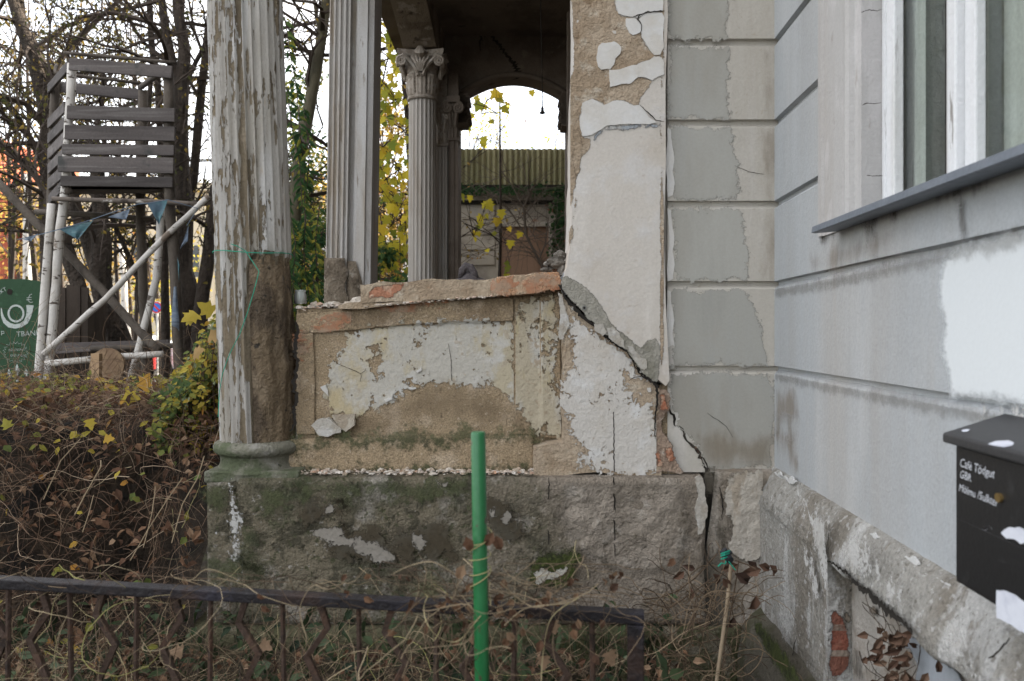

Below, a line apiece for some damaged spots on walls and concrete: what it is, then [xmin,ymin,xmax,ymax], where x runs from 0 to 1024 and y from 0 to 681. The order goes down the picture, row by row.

peeling [207,0,763,565]
crack [558,284,724,608]
flaking render [829,611,851,677]